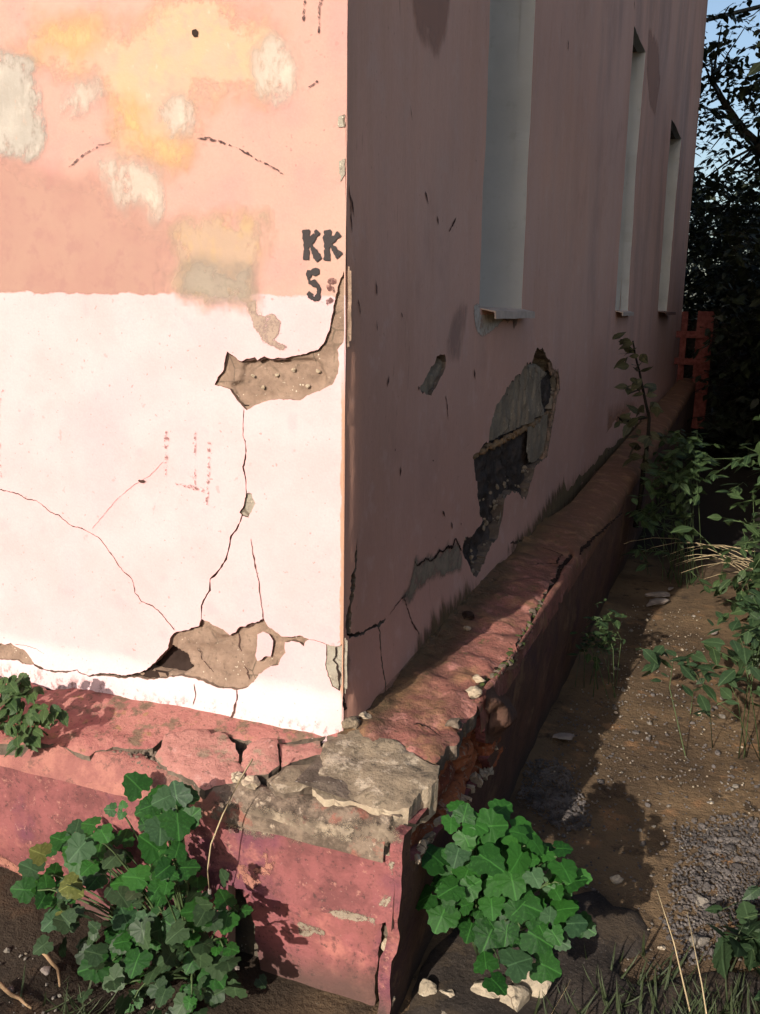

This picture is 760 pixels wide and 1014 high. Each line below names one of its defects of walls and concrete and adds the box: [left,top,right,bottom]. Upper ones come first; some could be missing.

leakage [415,0,449,49]
peeling [0,0,296,220]
spalling [216,264,352,409]
spalling [405,352,559,603]
crack [0,462,174,630]
crack [92,666,169,678]
spalling [140,619,308,688]
crack [230,690,238,718]
crack [232,529,264,621]
crack [390,594,419,633]
spalling [214,727,506,864]